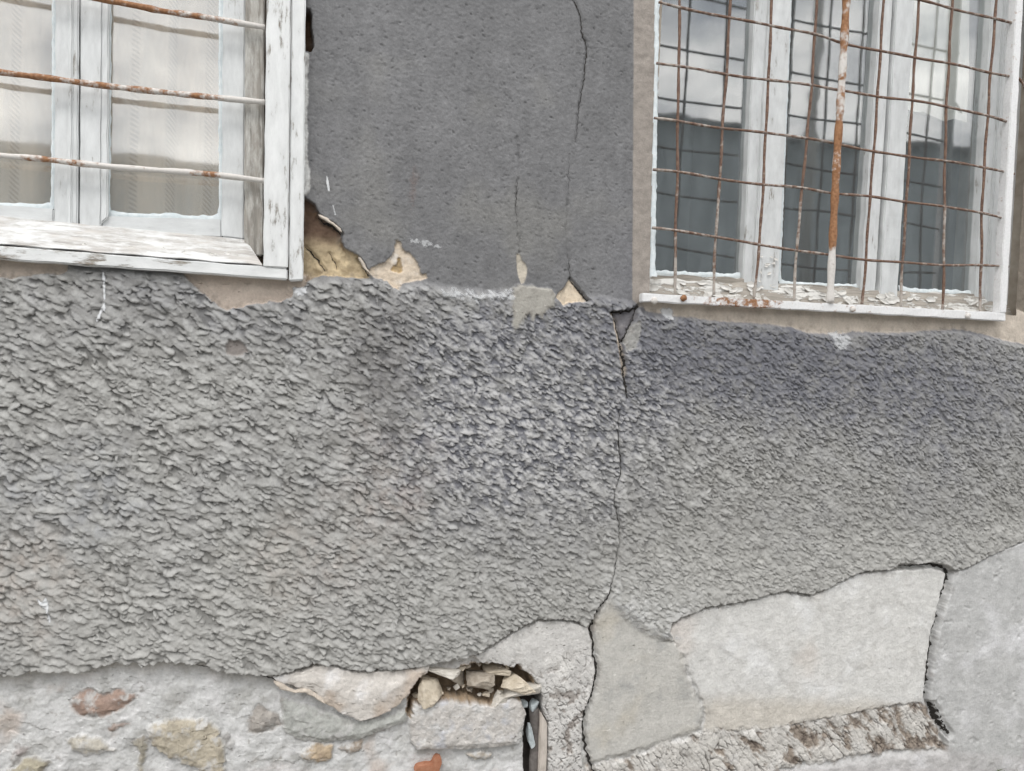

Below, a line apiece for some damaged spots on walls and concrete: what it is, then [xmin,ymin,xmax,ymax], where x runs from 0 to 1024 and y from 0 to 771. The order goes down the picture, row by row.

crack [572,0,587,136]
spalling [185,198,428,310]
peeling [516,253,528,283]
peeling [556,280,585,305]
crack [474,305,949,771]
peeling [272,660,542,721]